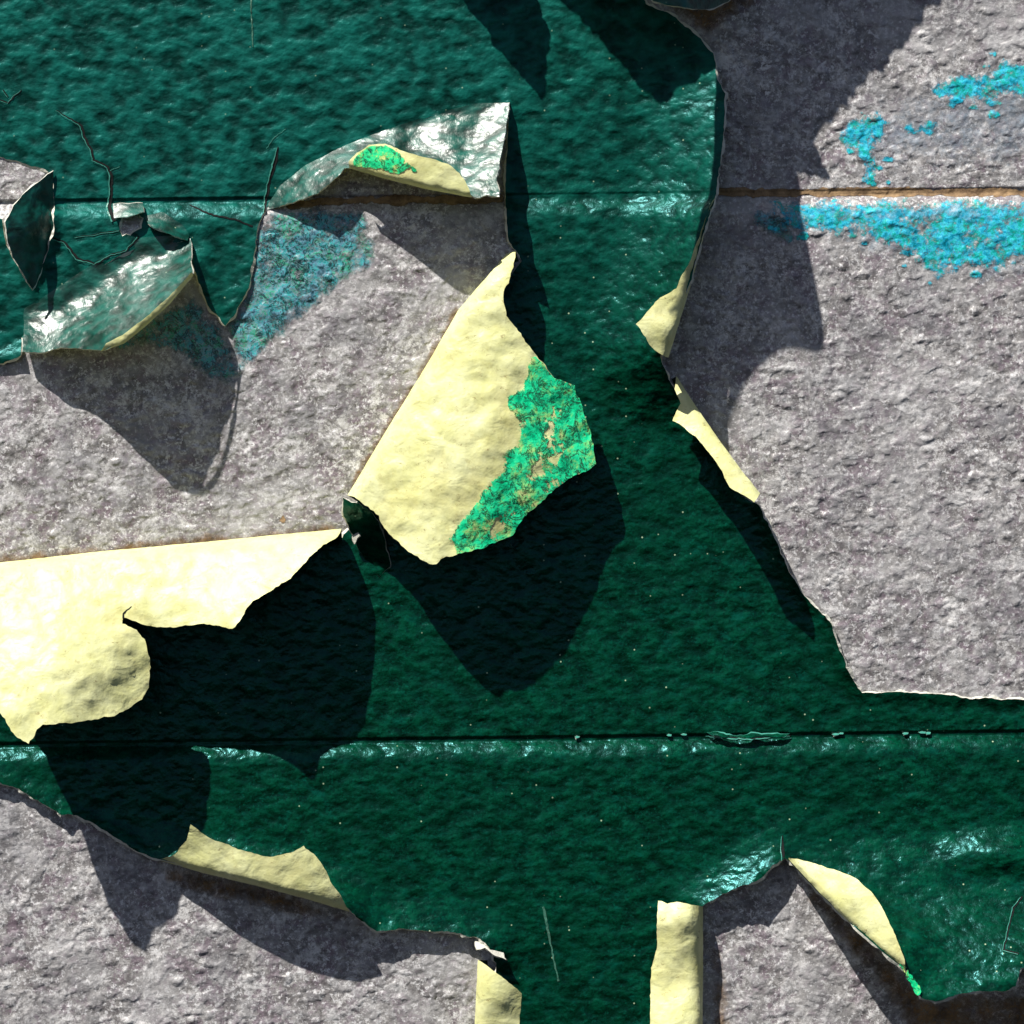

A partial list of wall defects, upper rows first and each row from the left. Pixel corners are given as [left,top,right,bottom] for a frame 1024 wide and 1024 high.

crack [0,89,21,104]
crack [52,110,139,265]
crack [190,128,286,227]
peeling [0,103,596,744]
peeling [636,0,1024,699]
peeling [707,731,788,739]
peeling [0,785,522,1024]
peeling [650,858,1024,1024]